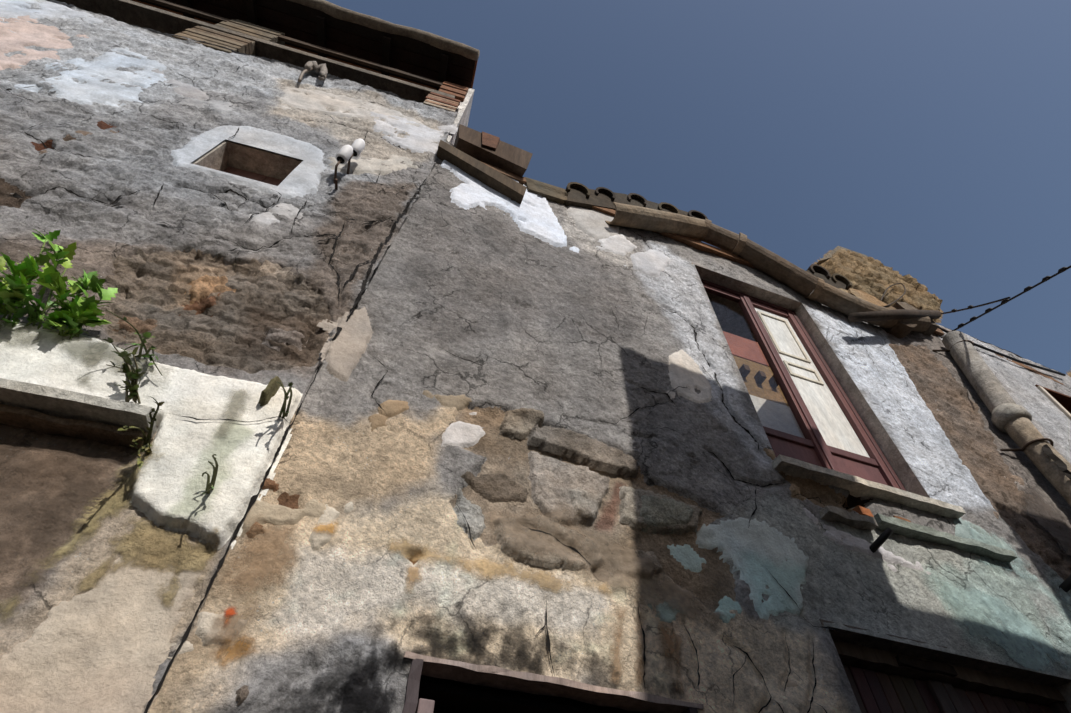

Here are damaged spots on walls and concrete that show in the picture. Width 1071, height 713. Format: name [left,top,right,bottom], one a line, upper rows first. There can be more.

crack [0,86,106,161]
flaking render [0,0,240,115]
flaking render [248,203,303,227]
flaking render [279,86,671,277]
leakage [0,423,134,555]
crack [9,169,427,713]
spalling [99,248,373,406]
spalling [422,390,809,623]
crack [589,301,773,454]
leakage [335,658,396,713]
crack [638,602,646,687]
crack [725,573,845,713]